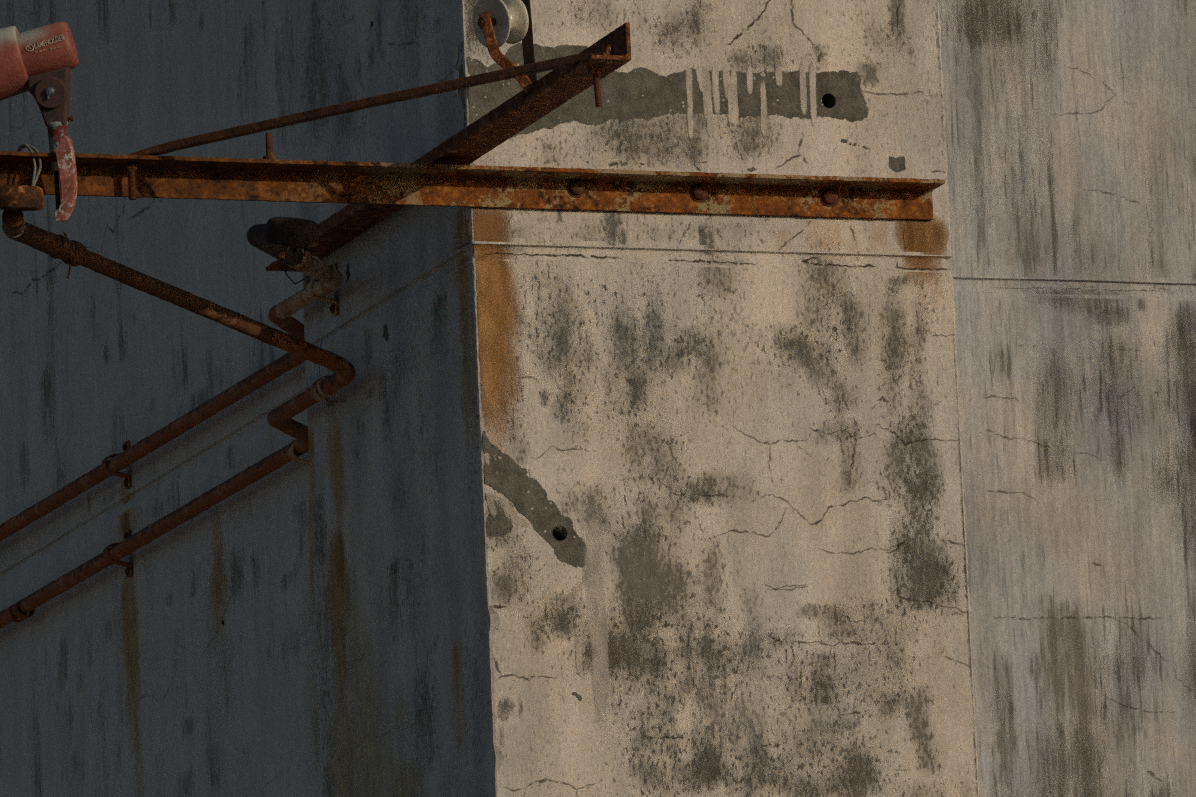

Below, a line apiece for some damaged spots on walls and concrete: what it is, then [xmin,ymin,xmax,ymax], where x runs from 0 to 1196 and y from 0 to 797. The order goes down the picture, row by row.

crack [729,0,828,62]
leakage [959,6,1011,43]
rust [898,219,946,275]
leakage [807,259,862,356]
leakage [650,331,717,372]
leakage [887,309,927,426]
leakage [894,460,956,610]
rust [330,534,347,680]
rust [123,585,138,710]
leakage [607,615,658,692]
leakage [831,746,882,797]
leakage [1043,730,1095,797]